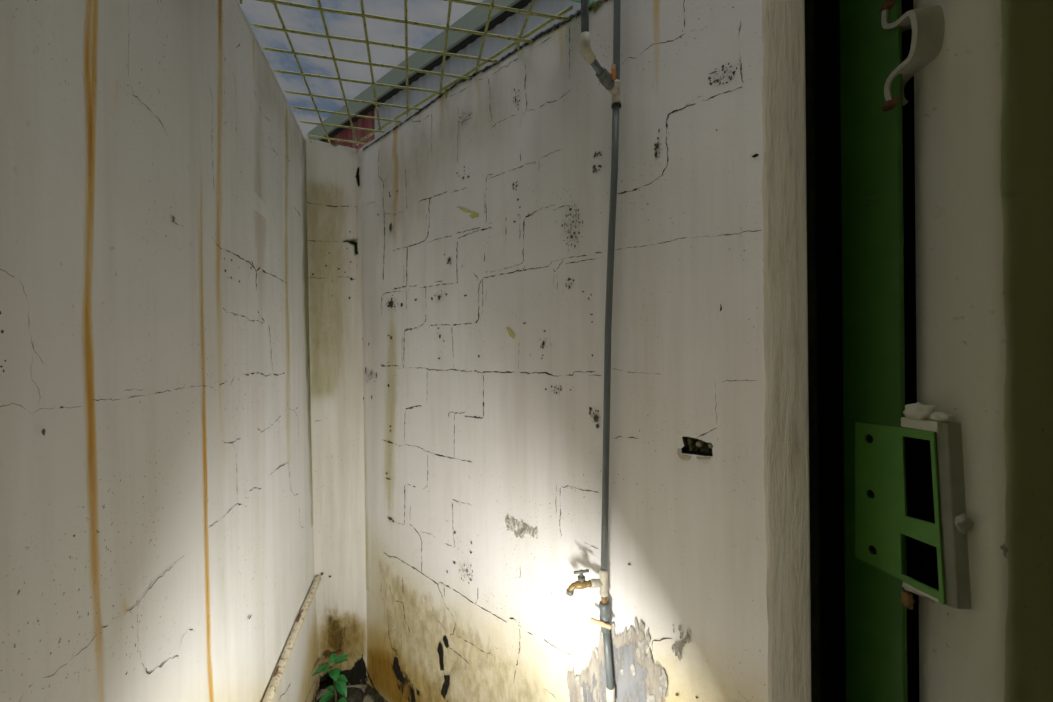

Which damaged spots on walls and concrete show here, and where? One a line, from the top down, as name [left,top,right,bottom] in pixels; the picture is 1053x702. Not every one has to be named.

crack [452,27,570,127]
crack [621,0,706,65]
crack [617,22,744,194]
crack [214,241,286,287]
crack [0,275,284,413]
crack [209,408,303,528]
crack [295,150,761,679]
spalling [677,437,713,460]
crack [44,558,181,678]
water stain [391,657,420,702]
water stain [437,636,450,702]
peeling [567,618,668,702]